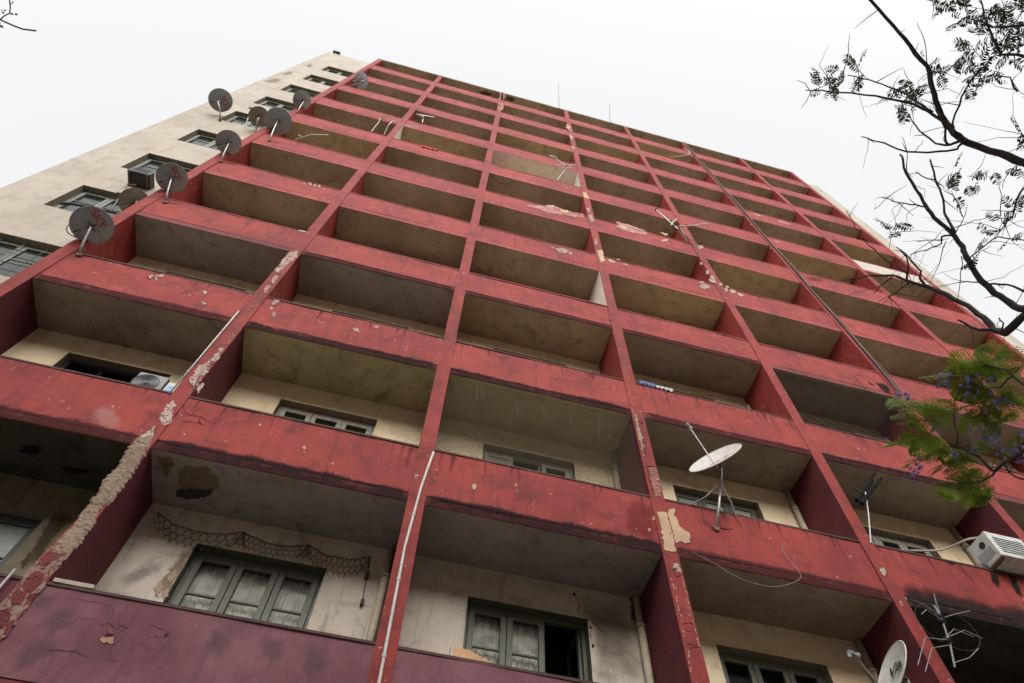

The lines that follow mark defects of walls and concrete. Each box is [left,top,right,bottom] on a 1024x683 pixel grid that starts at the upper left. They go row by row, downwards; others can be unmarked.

peeling [523,192,595,222]
peeling [616,222,668,242]
peeling [188,251,299,394]
flaking render [0,401,220,639]
damp [425,496,662,553]
peeling [635,508,701,673]
flaking render [100,629,114,645]